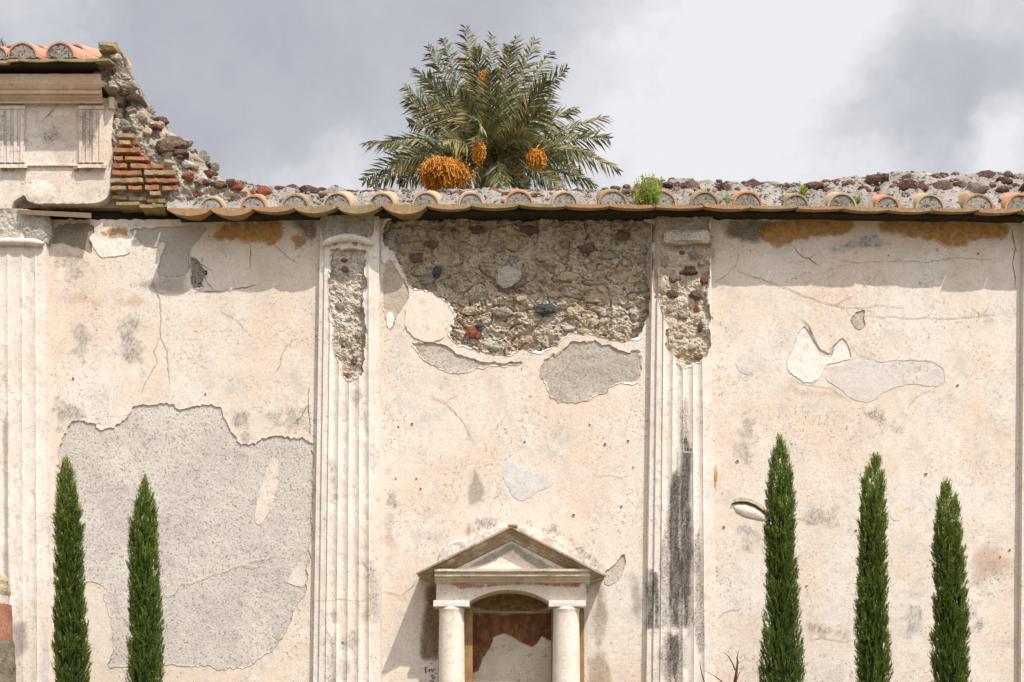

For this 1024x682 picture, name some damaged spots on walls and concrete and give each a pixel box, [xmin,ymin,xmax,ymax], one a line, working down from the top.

crack [142,278,171,391]
peeling [112,196,208,290]
leakage [214,221,315,249]
spalling [327,249,368,382]
spalling [380,216,715,404]
peeling [787,326,851,382]
crack [716,254,1009,407]
leakage [728,219,1008,250]
crack [796,230,1018,286]
peeling [55,393,316,670]
peeling [604,554,626,585]
leakage [646,407,704,682]